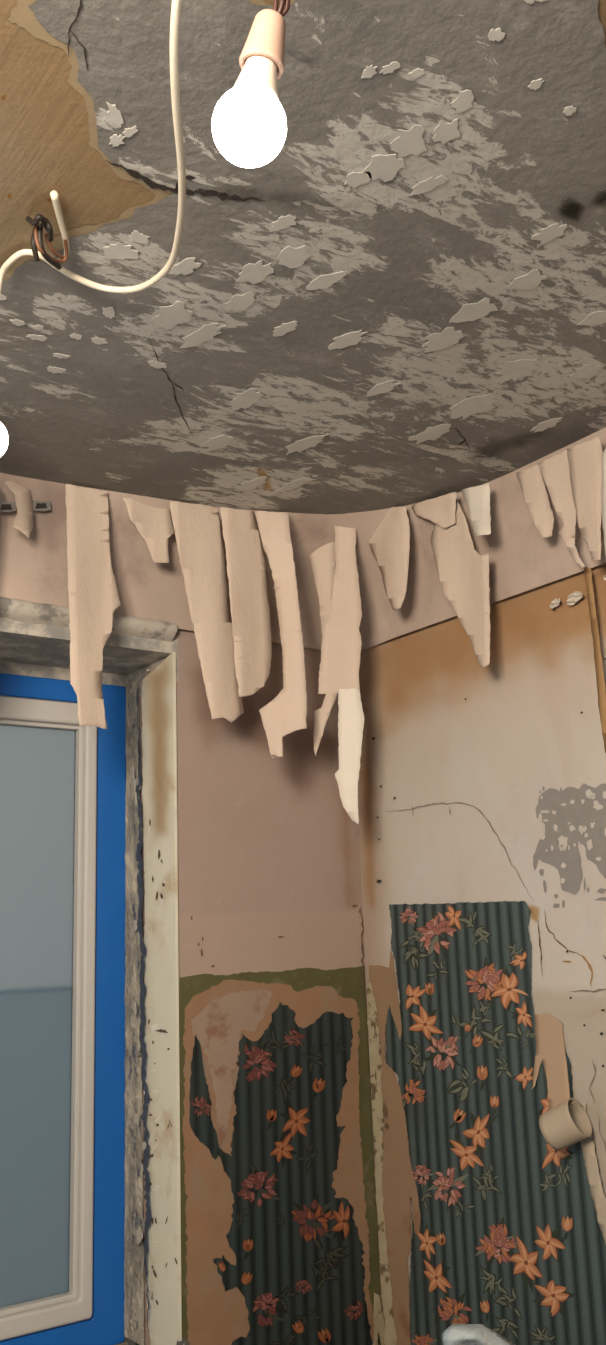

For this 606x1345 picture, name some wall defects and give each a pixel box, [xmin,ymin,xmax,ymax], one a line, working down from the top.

crack [68,0,88,71]
peeling [0,0,606,824]
crack [387,802,606,993]
flaking render [533,783,606,908]
flaking render [124,669,177,1345]
flaking render [366,982,397,1345]
peeling [532,1013,592,1151]